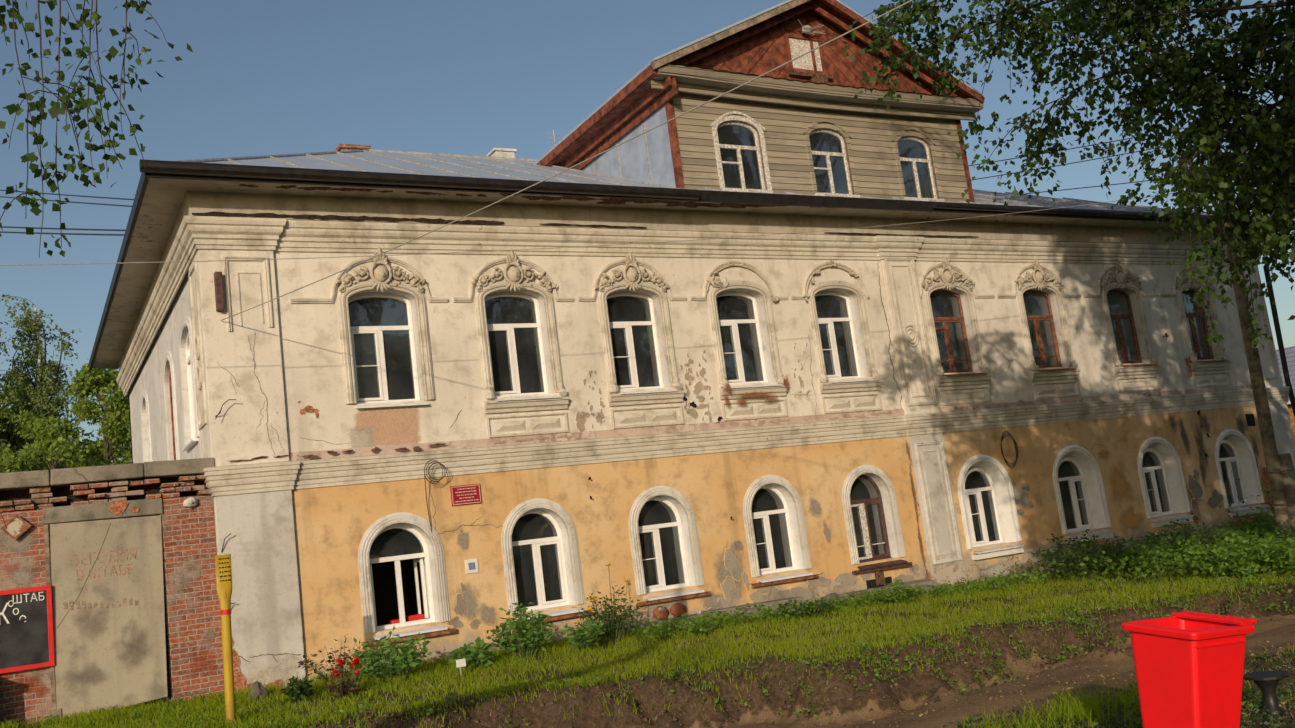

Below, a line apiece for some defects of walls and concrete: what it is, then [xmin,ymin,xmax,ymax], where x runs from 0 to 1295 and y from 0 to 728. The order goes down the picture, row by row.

flaking render [680,350,790,427]
spalling [232,639,283,693]